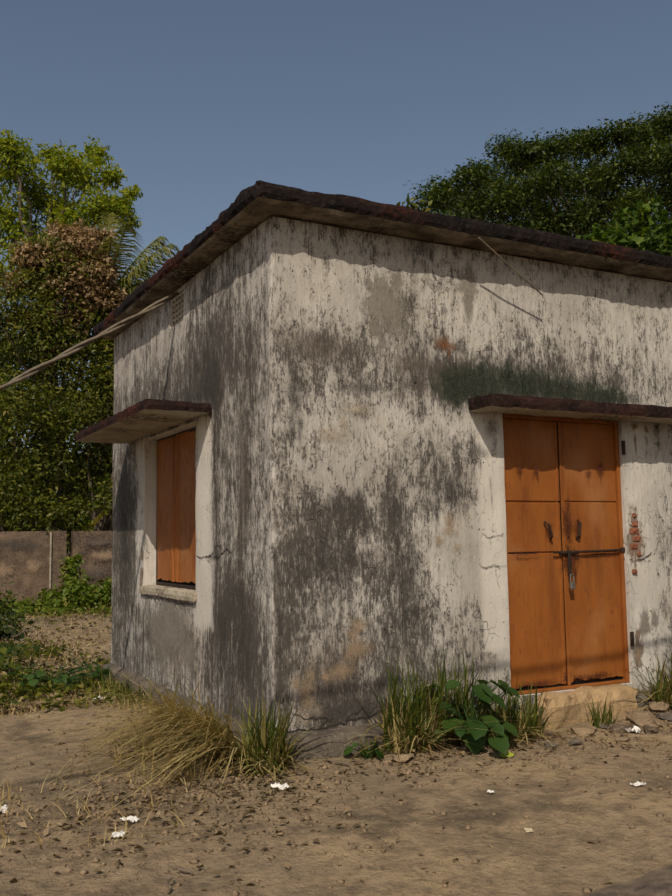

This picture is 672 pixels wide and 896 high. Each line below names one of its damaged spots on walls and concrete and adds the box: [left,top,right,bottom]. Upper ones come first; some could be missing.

water stain [456,263,477,321]
spalling [627,506,651,574]